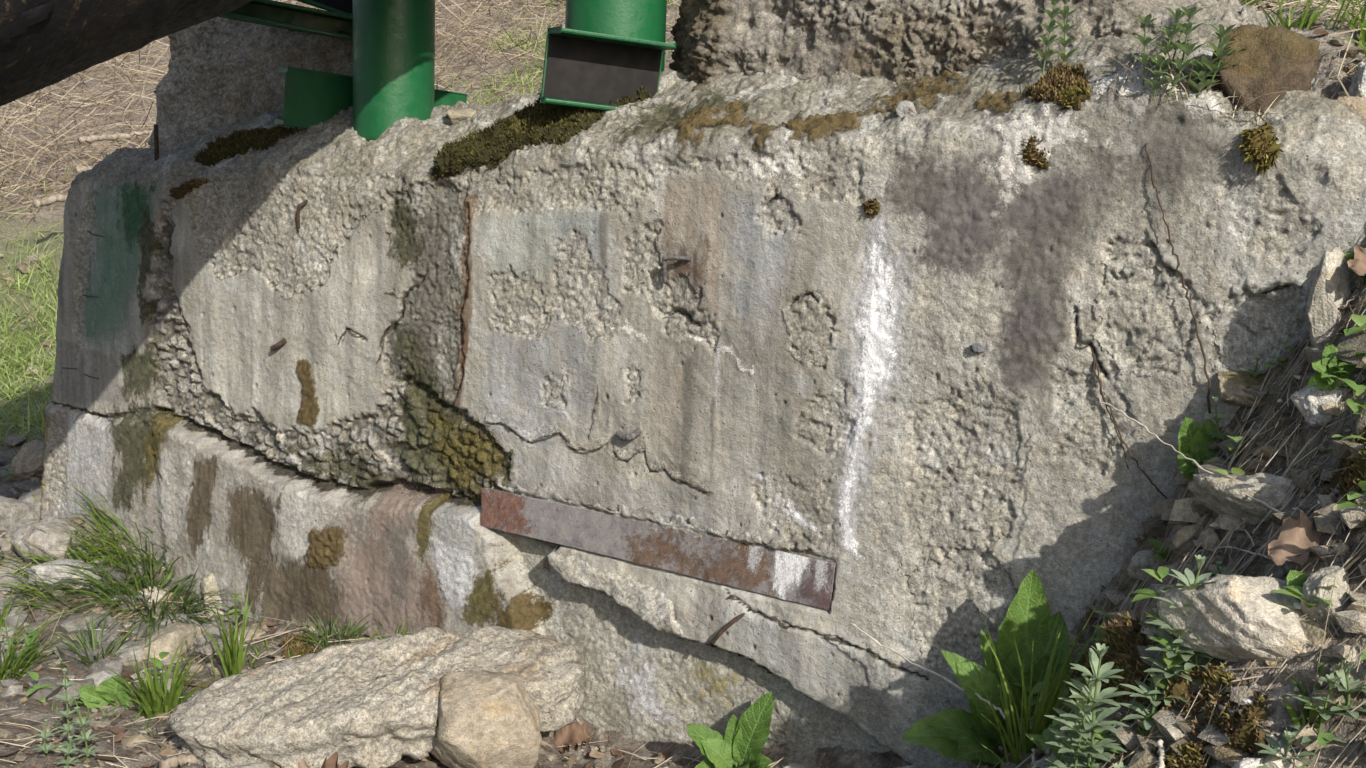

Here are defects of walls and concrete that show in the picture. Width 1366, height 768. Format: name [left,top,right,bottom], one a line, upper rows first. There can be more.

spalling [148,168,822,555]
leakage [837,59,1245,558]
crack [1074,310,1107,377]
rust [480,488,531,534]
rust [623,524,835,611]
crack [726,589,929,680]